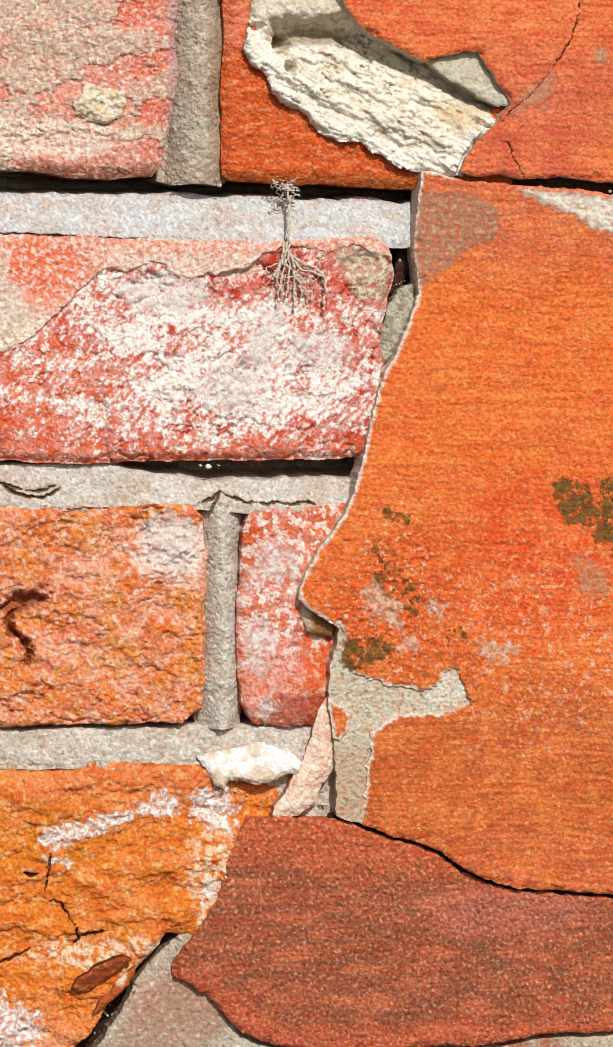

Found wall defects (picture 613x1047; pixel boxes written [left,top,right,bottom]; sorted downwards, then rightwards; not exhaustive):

spalling [242,0,510,177]
crack [502,0,613,195]
spalling [0,245,394,464]
spalling [0,585,51,667]
peeling [362,578,424,655]
peeling [425,598,449,622]
peeling [477,640,520,662]
flaking render [270,605,471,824]
crack [327,812,562,891]
crack [23,853,105,943]
crack [0,947,31,963]
peeling [71,954,135,1015]